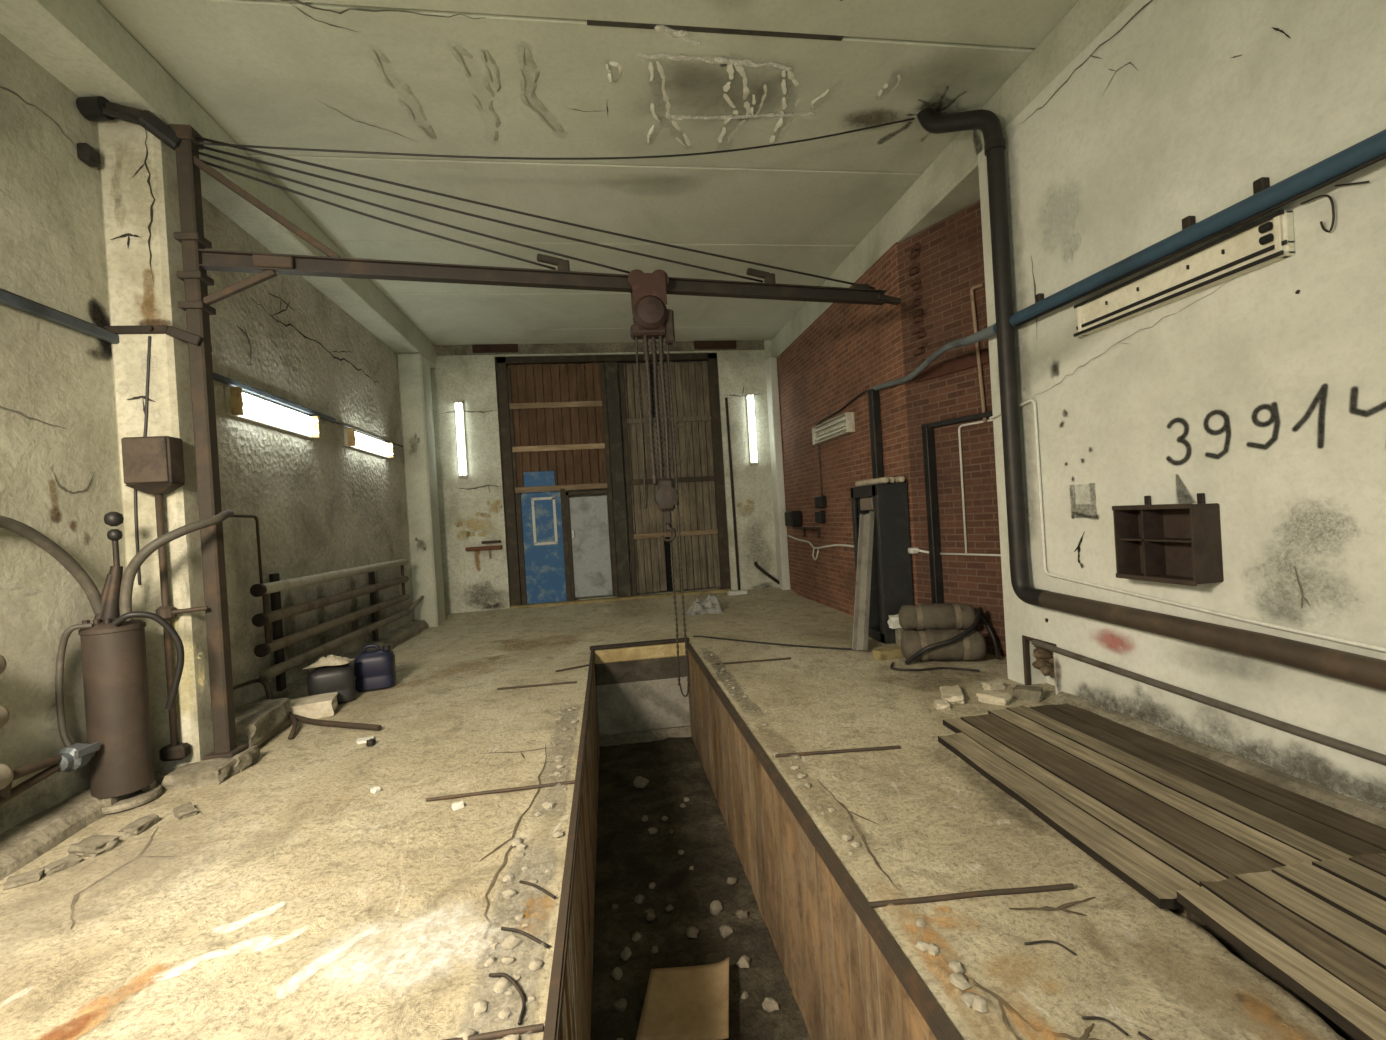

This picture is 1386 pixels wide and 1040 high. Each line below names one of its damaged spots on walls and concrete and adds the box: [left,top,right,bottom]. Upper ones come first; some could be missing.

crack [282,0,485,32]
peeling [450,45,501,141]
peeling [647,61,691,147]
peeling [718,59,841,143]
water stain [853,87,965,144]
corrosion [140,270,170,326]
crack [236,293,387,391]
water stain [1079,686,1386,810]
crack [480,744,551,957]
crack [817,779,900,891]
corrosion [40,964,167,1040]
crack [928,940,1100,1040]